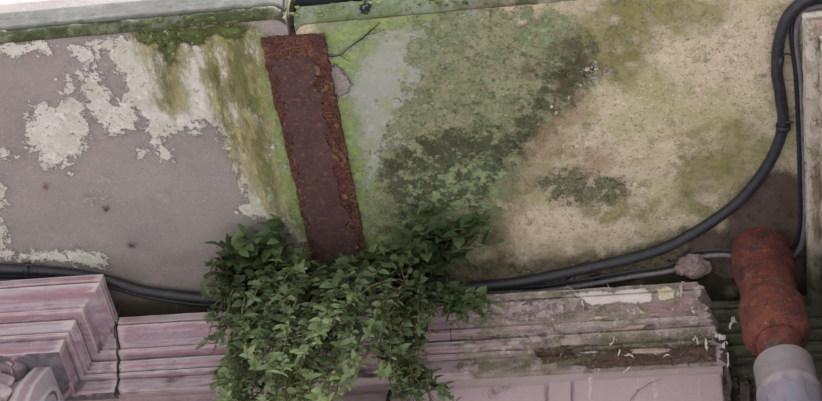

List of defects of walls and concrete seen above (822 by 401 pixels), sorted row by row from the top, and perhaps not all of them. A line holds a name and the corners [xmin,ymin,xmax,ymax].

peeling [0,29,309,250]
water stain [210,64,230,131]
water stain [230,24,306,237]
water stain [320,6,687,284]
peeling [0,175,116,275]
water stain [527,172,807,291]
crack [114,302,123,396]
flaking render [474,281,737,374]
flaking render [731,376,754,401]